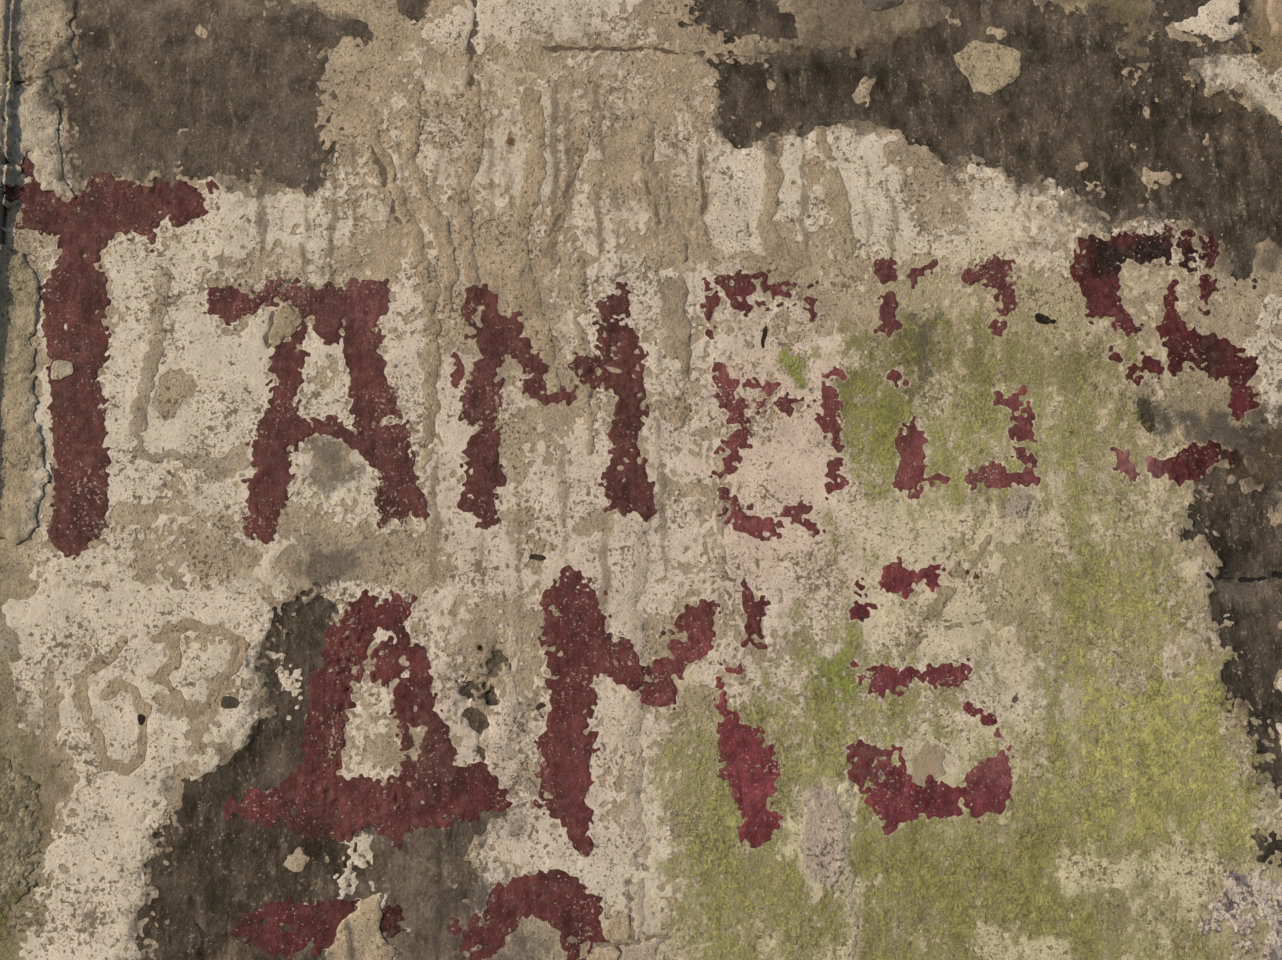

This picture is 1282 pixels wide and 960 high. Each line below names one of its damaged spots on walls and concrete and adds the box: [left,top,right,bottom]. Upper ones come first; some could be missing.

water stain [256,186,282,251]
water stain [328,156,355,279]
water stain [799,157,809,244]
peeling [1,227,73,486]
peeling [292,323,356,432]
peeling [495,368,538,421]
spalling [1028,301,1057,336]
peeling [168,630,232,704]
peeling [370,627,397,648]
peeling [339,661,409,785]
peeling [963,885,1085,960]
water stain [1195,865,1282,960]